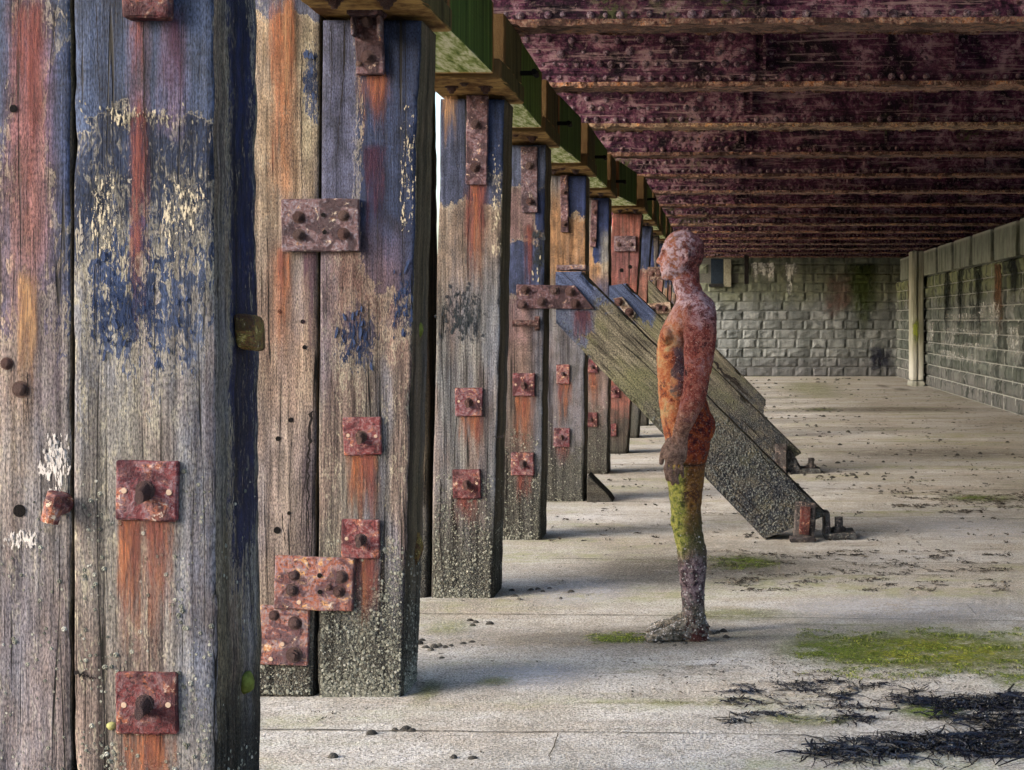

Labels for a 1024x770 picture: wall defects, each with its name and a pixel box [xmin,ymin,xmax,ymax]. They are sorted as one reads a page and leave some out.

peeling [99,103,193,132]
peeling [162,174,204,268]
rust [466,185,486,256]
peeling [86,171,181,369]
peeling [335,306,373,374]
peeling [392,259,413,339]
leakage [943,265,999,364]
leakage [1006,258,1018,292]
peeling [38,433,71,492]
peeling [3,529,43,549]
rust [118,520,168,596]
rust [355,559,377,600]